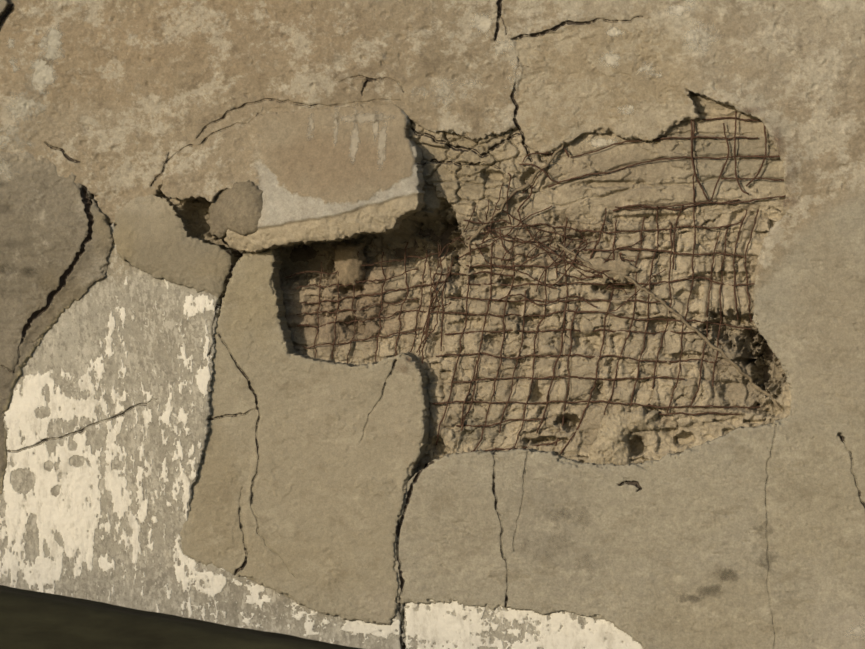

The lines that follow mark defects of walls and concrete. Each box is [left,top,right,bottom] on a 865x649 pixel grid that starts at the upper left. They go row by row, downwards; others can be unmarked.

crack [0,3,14,29]
crack [45,143,80,163]
crack [411,0,643,169]
crack [1,187,93,373]
crack [8,401,150,452]
crack [207,235,266,575]
peeling [0,92,792,649]
crack [396,461,434,649]
crack [492,449,530,607]
crack [839,434,865,508]